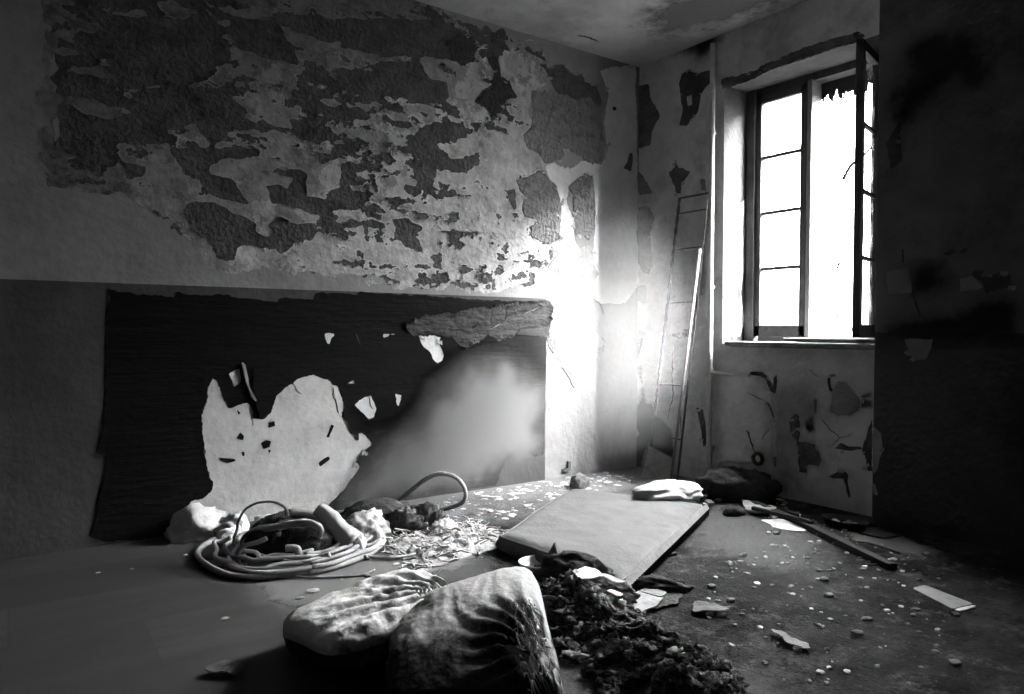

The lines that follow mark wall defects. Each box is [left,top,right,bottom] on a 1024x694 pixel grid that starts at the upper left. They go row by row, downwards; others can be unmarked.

spalling [669,160,706,196]
peeling [37,0,611,542]
peeling [904,338,933,362]
spalling [790,414,823,475]
spalling [834,420,884,474]
spalling [829,468,850,498]